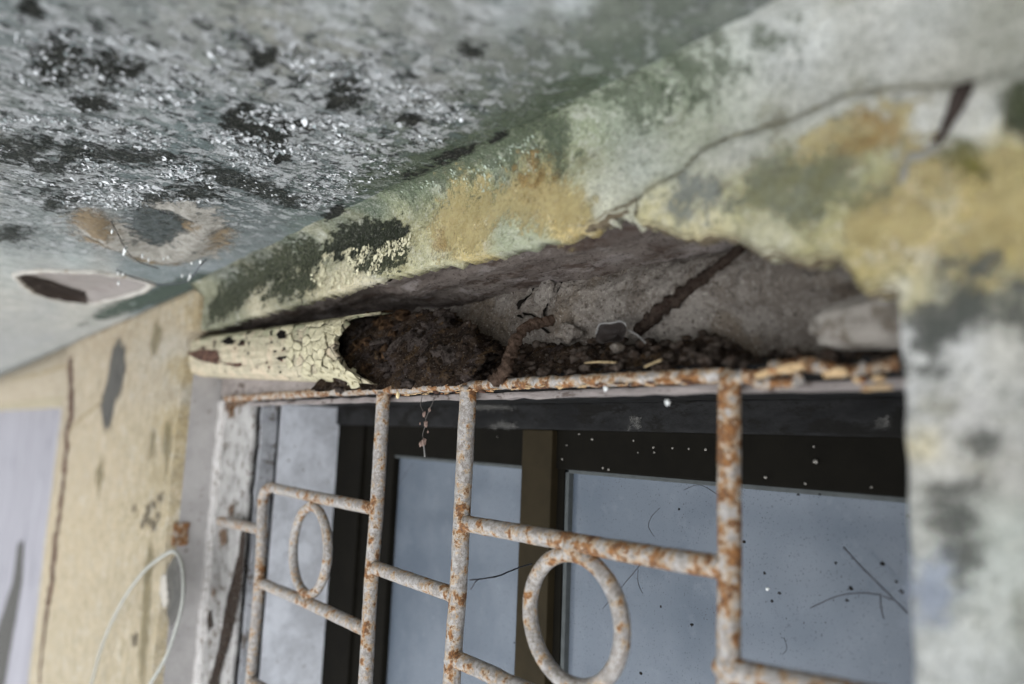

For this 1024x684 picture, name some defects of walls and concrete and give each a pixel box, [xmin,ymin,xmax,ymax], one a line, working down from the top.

mould [11,0,146,117]
mould [0,131,411,331]
mould [228,42,280,74]
mould [214,102,314,166]
mould [318,72,371,116]
mould [394,110,426,128]
mould [395,130,510,181]
leakage [668,144,895,238]
crack [615,84,954,211]
spalling [11,268,156,306]
spalling [188,197,901,389]
leakage [905,238,1024,382]